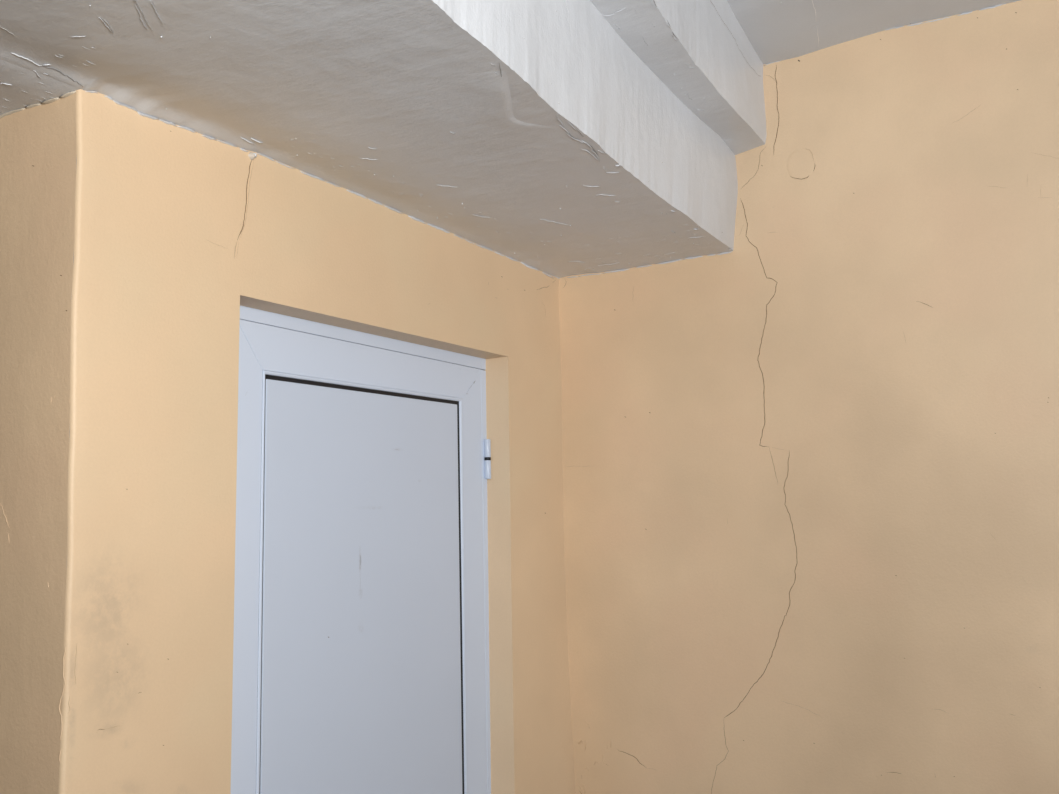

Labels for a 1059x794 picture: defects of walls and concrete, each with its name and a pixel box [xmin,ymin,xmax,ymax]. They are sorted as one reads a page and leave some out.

crack [216,160,254,258]